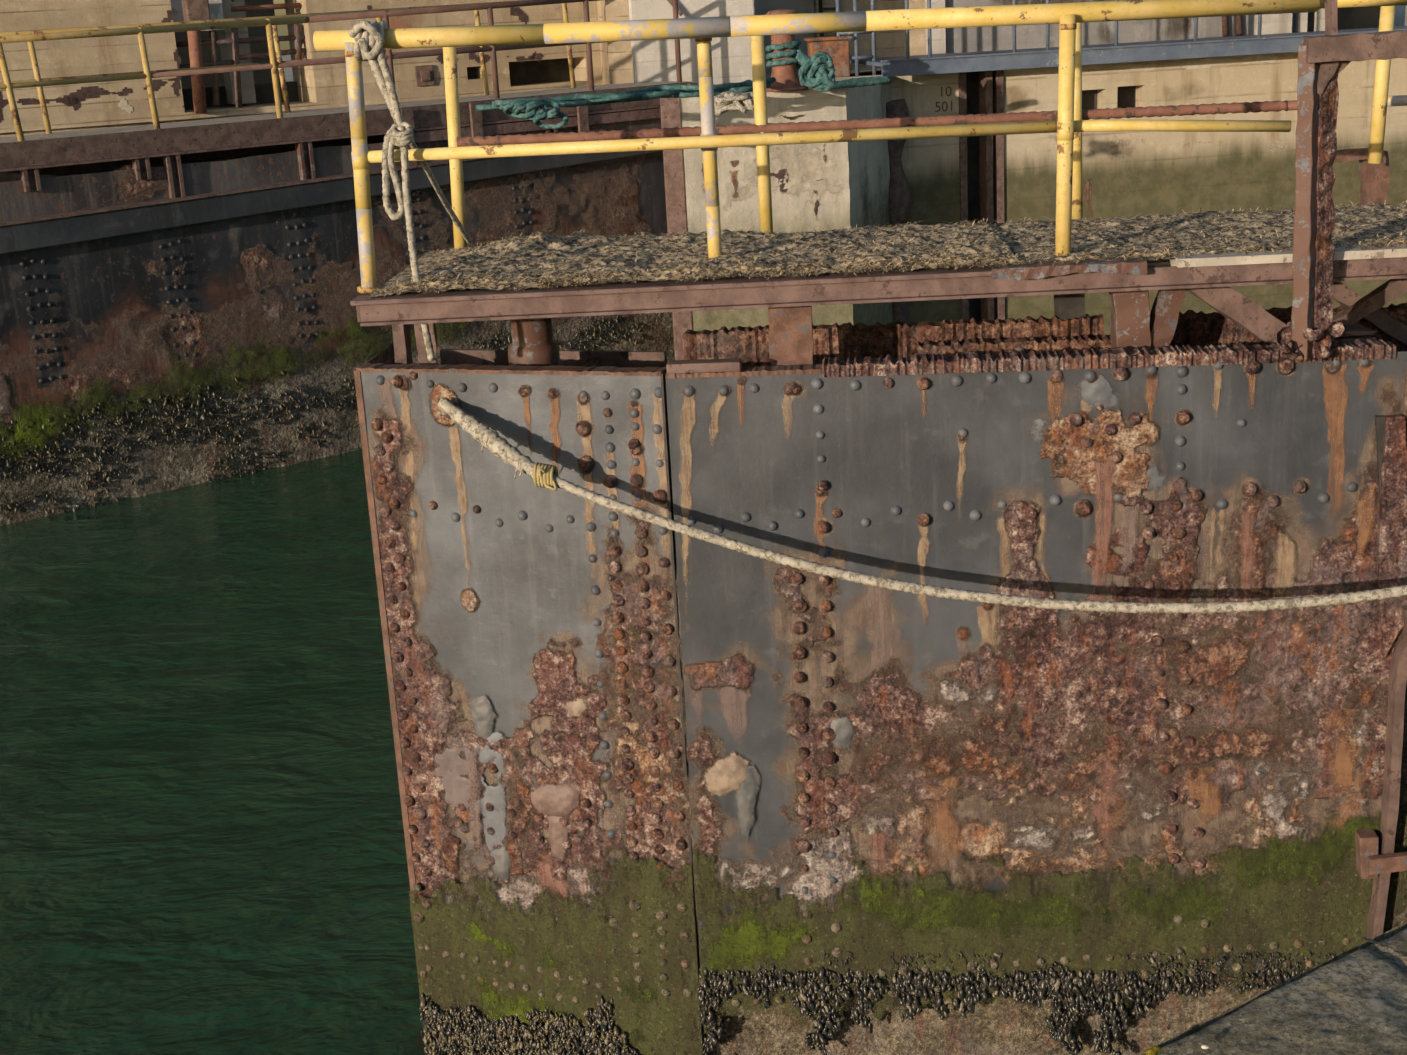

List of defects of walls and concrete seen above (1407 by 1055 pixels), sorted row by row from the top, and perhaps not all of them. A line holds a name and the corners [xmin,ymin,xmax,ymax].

corrosion [0,154,651,418]
corrosion [518,385,561,467]
corrosion [370,375,473,902]
corrosion [460,588,480,613]
corrosion [575,358,1404,914]
corrosion [537,858,567,923]